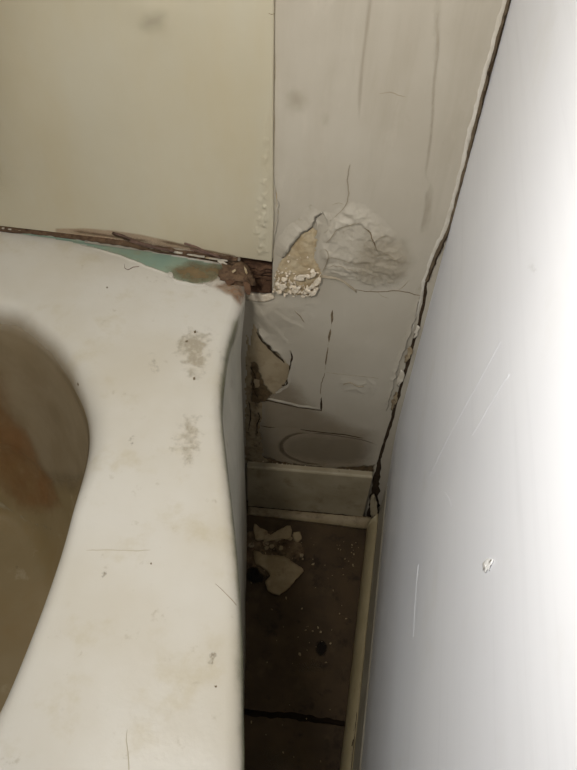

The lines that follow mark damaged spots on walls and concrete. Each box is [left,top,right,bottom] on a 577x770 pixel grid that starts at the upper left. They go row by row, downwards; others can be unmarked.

flaking render [241,179,331,298]
crack [322,0,511,517]
peeling [244,324,298,463]
crack [266,310,333,411]